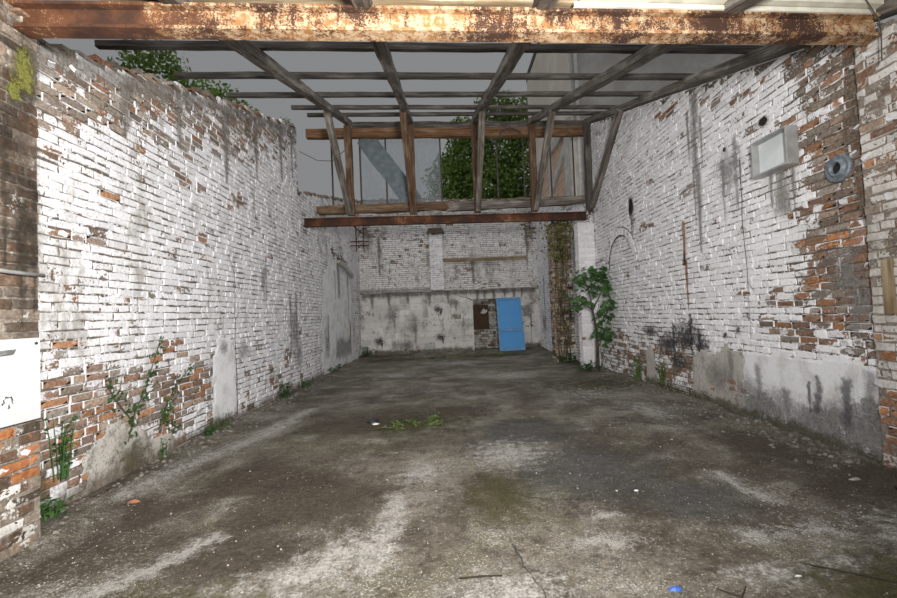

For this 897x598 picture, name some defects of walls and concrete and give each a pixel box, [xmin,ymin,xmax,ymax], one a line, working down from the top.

peeling [653,100,678,124]
peeling [699,74,770,112]
peeling [737,49,897,368]
spalling [0,339,224,510]
water stain [715,353,882,449]
spalling [874,378,897,445]